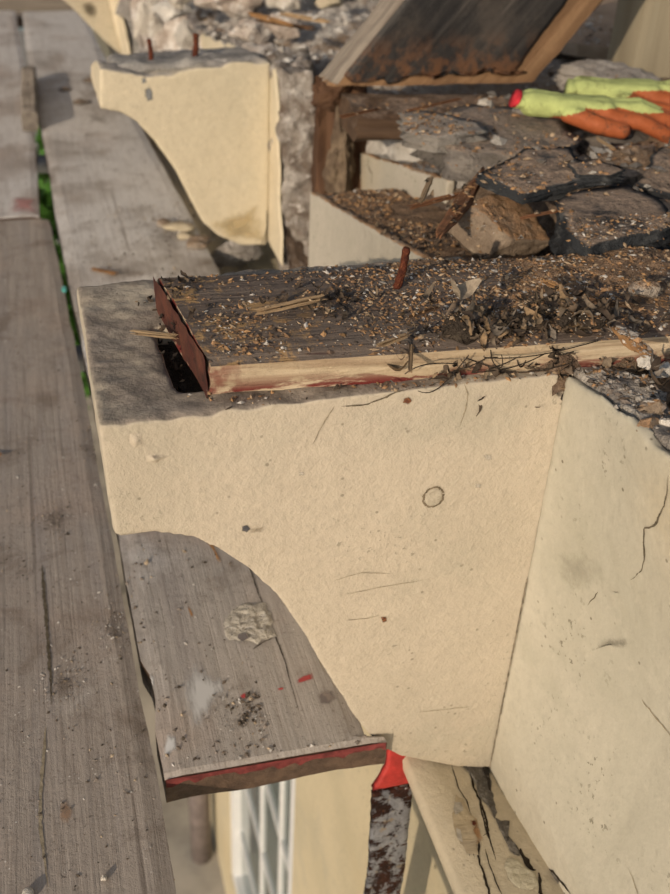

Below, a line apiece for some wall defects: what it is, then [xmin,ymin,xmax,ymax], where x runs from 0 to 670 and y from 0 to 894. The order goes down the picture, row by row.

crack [632,478,668,579]
crack [452,578,528,894]
crack [519,848,570,894]